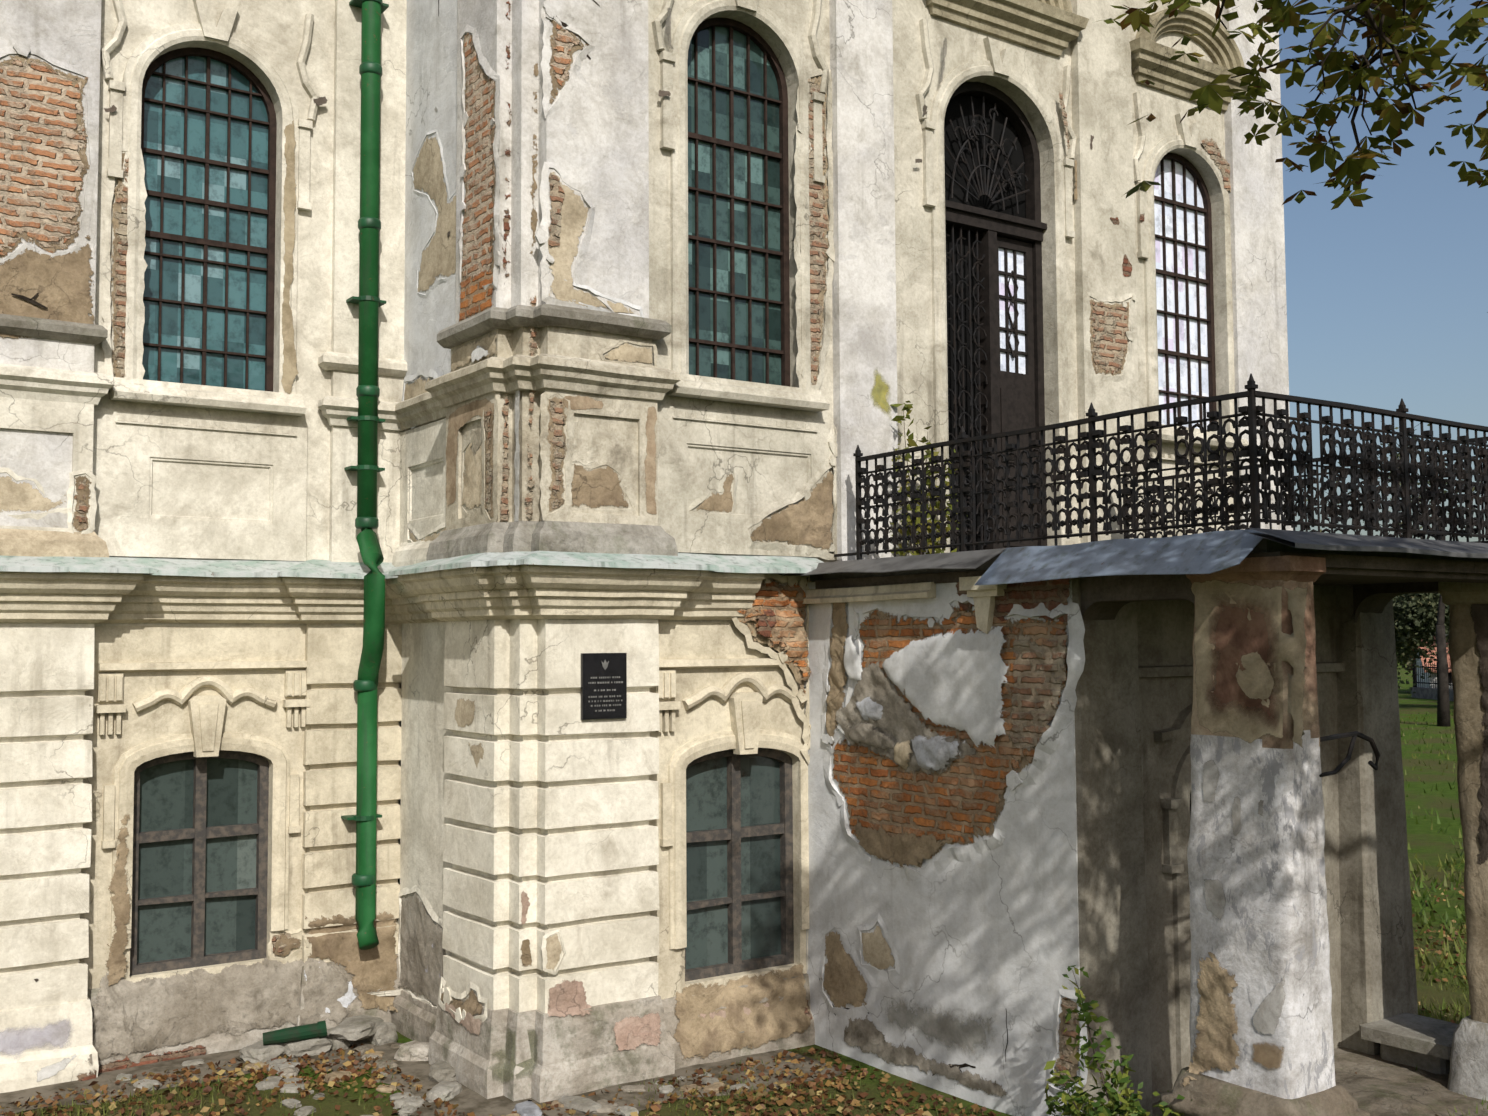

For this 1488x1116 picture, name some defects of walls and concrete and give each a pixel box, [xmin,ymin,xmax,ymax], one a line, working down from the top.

spalling [532,0,595,118]
spalling [0,40,148,390]
spalling [411,24,512,322]
spalling [530,134,644,317]
spalling [402,329,498,401]
spalling [598,338,658,368]
spalling [1084,255,1136,382]
spalling [688,422,837,560]
spalling [731,573,1085,886]
spalling [37,814,488,1082]
spalling [614,913,1007,1098]
spalling [1181,952,1285,1087]